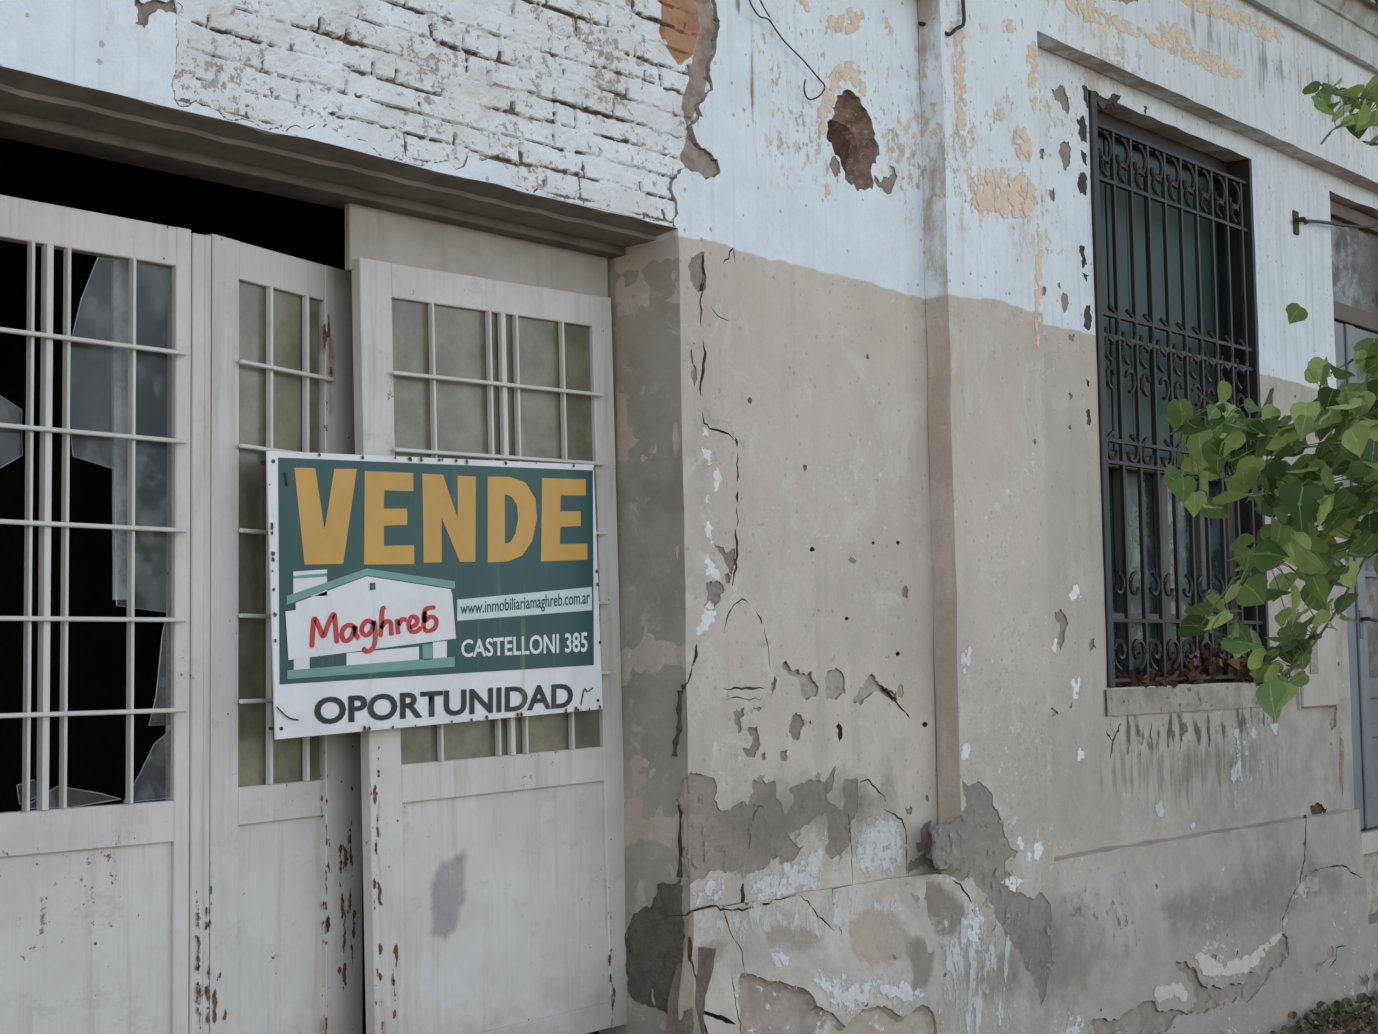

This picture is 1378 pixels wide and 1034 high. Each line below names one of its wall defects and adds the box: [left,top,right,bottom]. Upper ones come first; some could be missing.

flaking render [134,0,720,227]
rust [195,886,227,1034]
rust [321,795,356,1034]
rust [370,747,380,855]
rust [375,944,399,1034]
crack [673,805,853,1034]
peeling [625,661,904,1014]
flaking render [733,972,944,1034]
crack [861,779,907,874]
peeling [905,774,1058,1005]
water stain [1127,708,1274,755]
crack [1282,815,1362,929]